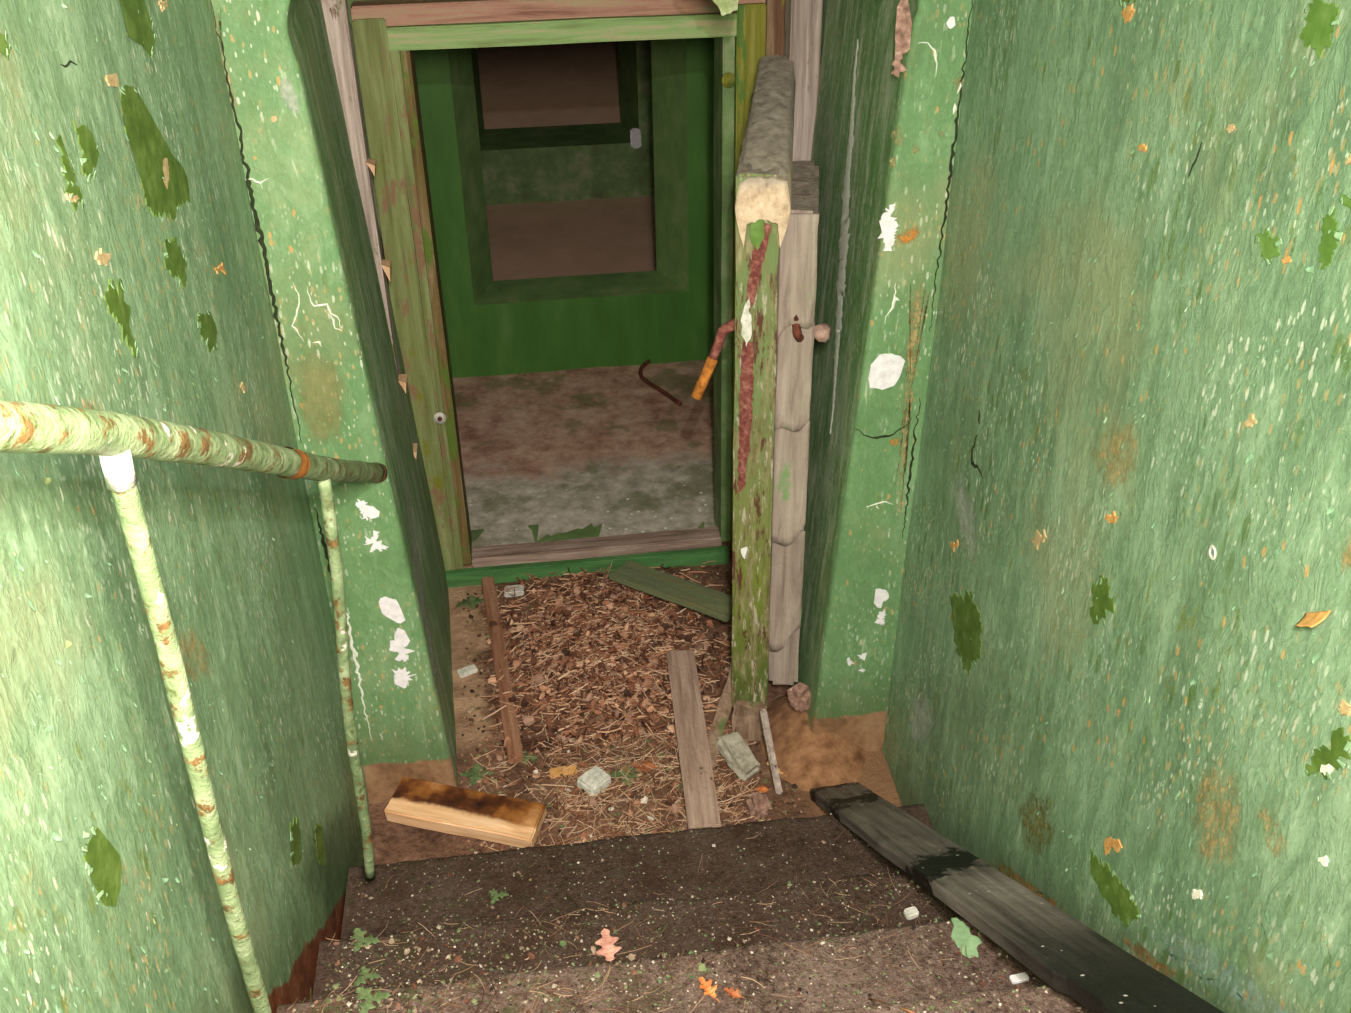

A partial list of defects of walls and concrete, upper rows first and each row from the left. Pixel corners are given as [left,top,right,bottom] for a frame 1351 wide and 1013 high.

peeling [105,73,225,288]
crack [210,0,343,443]
crack [920,0,973,331]
crack [830,39,921,538]
corrosion [278,446,310,479]
crack [971,411,983,479]
crack [314,508,331,575]
peeling [1065,833,1146,928]
peeling [3,984,98,1013]